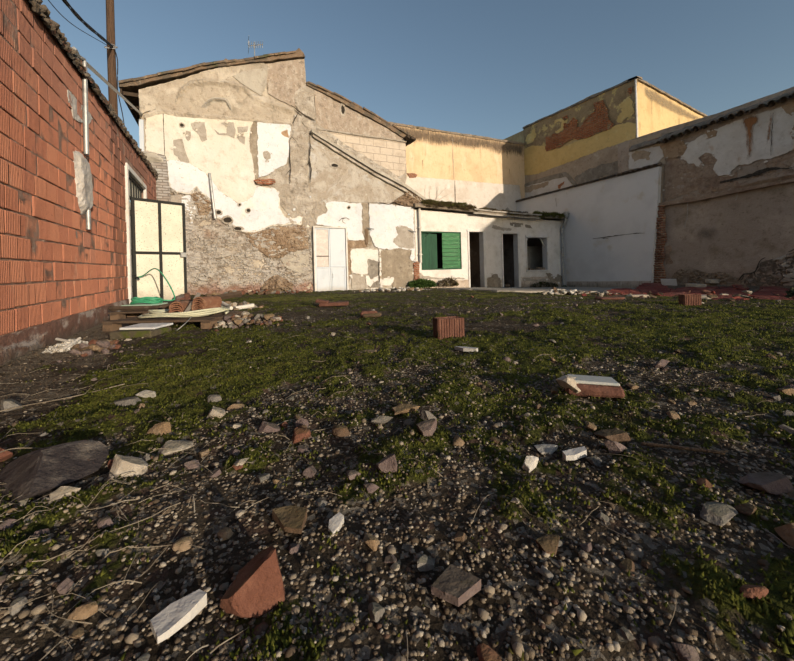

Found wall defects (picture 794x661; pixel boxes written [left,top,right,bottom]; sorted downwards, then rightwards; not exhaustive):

flaking render [523,79,638,151]
corrosion [743,116,758,156]
flaking render [660,140,762,205]
flaking render [170,115,327,295]
flaking render [362,203,372,247]
flaking render [349,226,465,289]
flaking render [671,252,794,287]